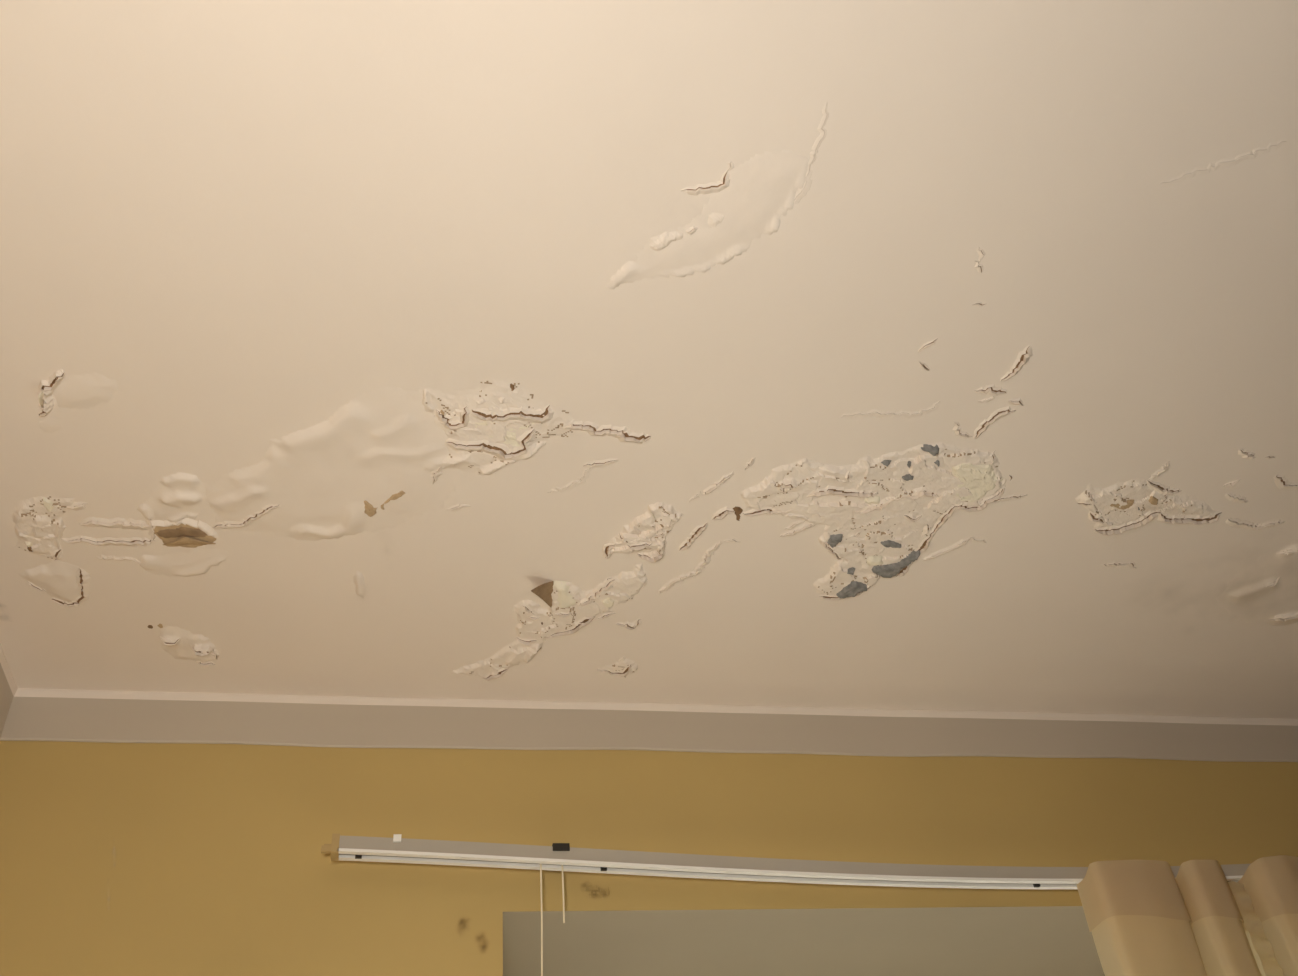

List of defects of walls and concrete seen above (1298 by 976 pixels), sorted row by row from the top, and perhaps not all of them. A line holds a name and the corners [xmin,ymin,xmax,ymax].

peeling [38,369,66,417]
peeling [422,377,583,477]
crack [918,338,938,371]
crack [841,345,1033,439]
peeling [11,494,75,560]
spalling [148,518,219,548]
peeling [741,442,1007,600]
peeling [1075,461,1222,535]
crack [1223,449,1298,530]
peeling [447,502,684,680]